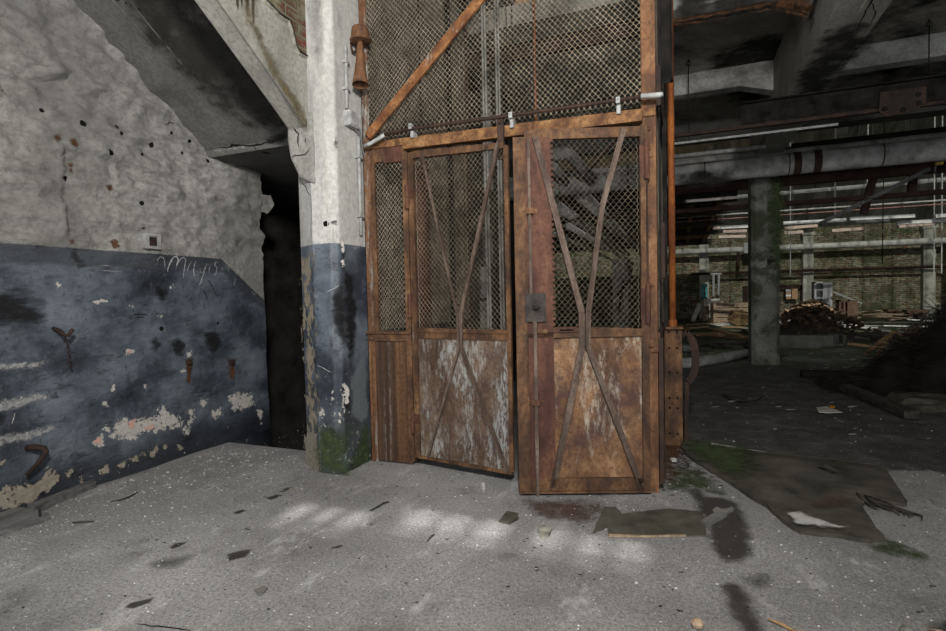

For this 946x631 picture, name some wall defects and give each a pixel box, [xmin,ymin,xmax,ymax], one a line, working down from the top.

flaking render [263,0,308,60]
leakage [677,0,745,14]
leakage [711,35,782,69]
leakage [798,23,872,94]
crack [857,0,876,28]
leakage [332,272,357,358]
peeling [86,250,349,555]
flaking render [0,468,83,510]